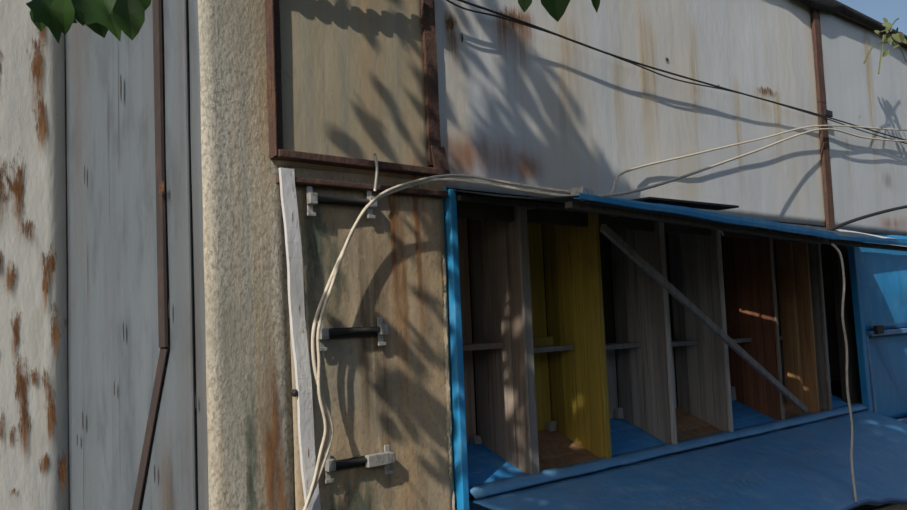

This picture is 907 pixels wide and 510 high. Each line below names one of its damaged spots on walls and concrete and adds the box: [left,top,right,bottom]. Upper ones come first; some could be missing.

rust [27,29,46,140]
rust [0,160,33,237]
rust [0,252,16,289]
rust [42,244,59,349]
rust [0,312,57,452]
rust [40,453,67,481]